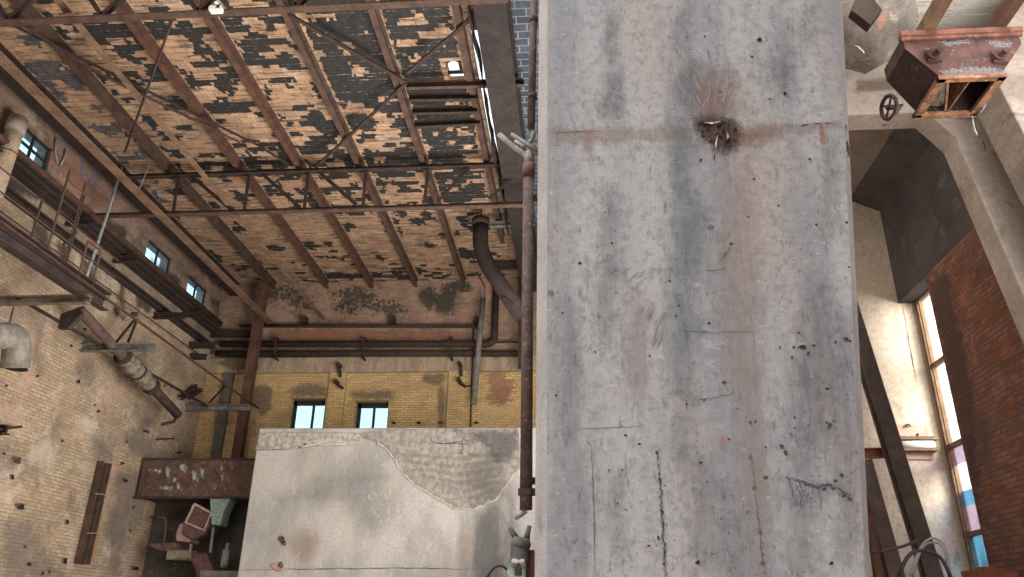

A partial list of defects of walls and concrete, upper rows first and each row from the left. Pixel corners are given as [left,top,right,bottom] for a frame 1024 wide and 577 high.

peeling [0,6,42,48]
peeling [24,61,87,103]
spalling [694,116,740,160]
peeling [35,0,488,323]
leakage [418,280,473,315]
peeling [364,421,520,511]
crack [655,449,668,577]
crack [787,474,852,514]